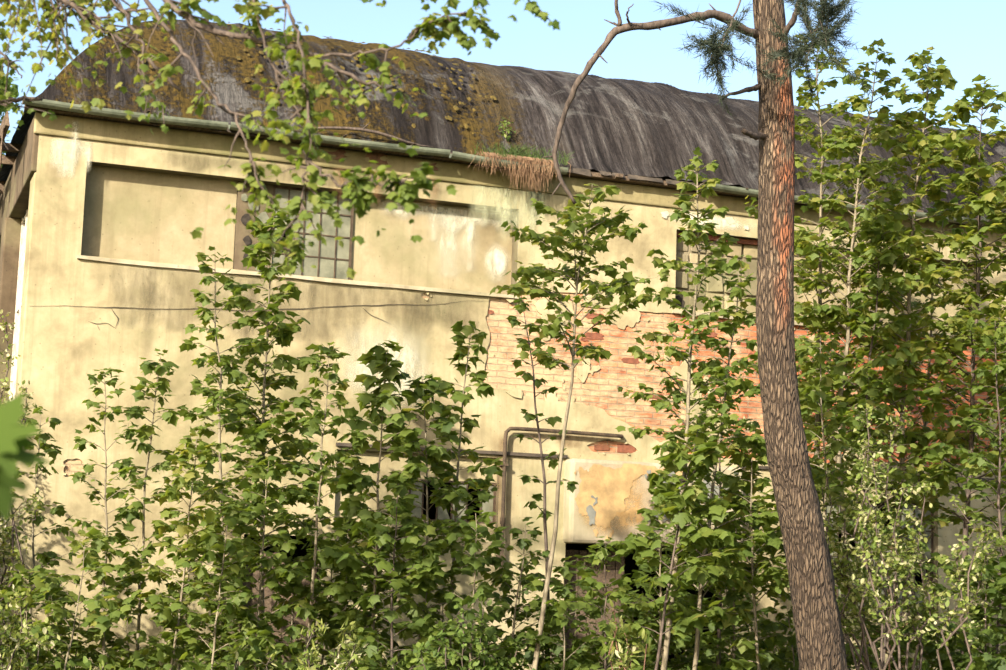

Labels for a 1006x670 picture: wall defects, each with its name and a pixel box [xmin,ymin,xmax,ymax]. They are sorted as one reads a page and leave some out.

damp [53,122,90,171]
spalling [483,282,765,475]
spalling [794,325,1006,469]
peeling [574,439,683,539]